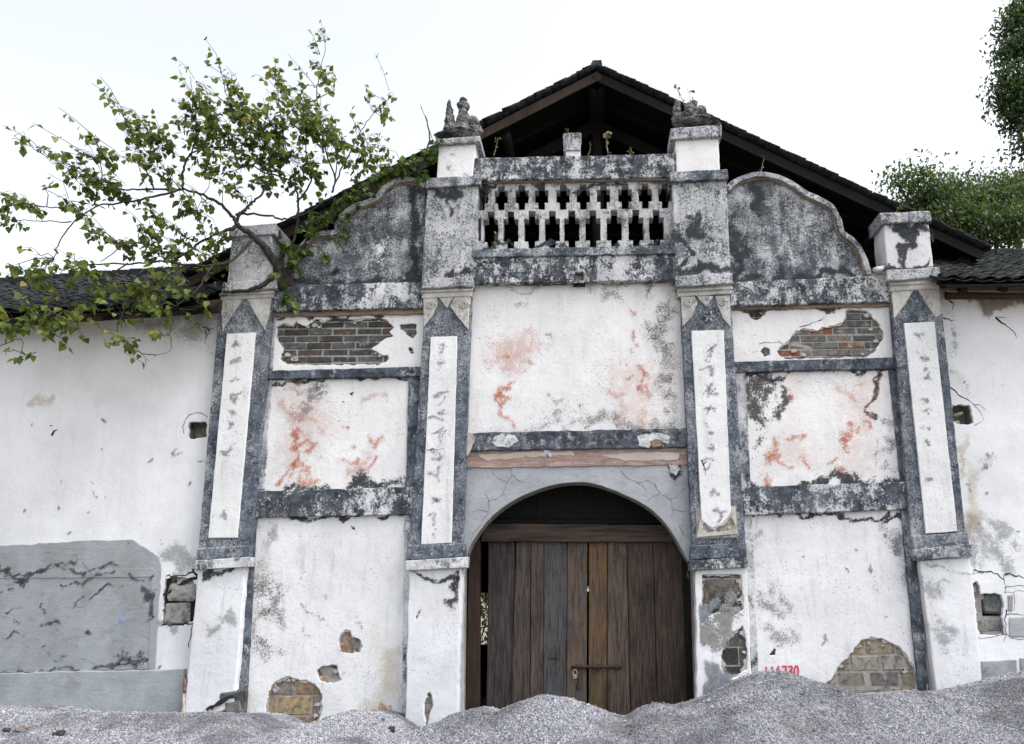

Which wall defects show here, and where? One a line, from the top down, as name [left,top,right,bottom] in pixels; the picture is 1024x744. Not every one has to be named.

damp [292,186,423,285]
flaking render [276,317,417,366]
damp [529,181,856,432]
flaking render [761,309,884,360]
spalling [182,412,207,439]
spalling [952,405,972,425]
crack [621,471,689,543]
flaking render [161,569,198,648]
crack [974,569,1024,640]
flaking render [266,664,341,723]
flaking render [721,626,751,678]
flaking render [826,637,916,693]